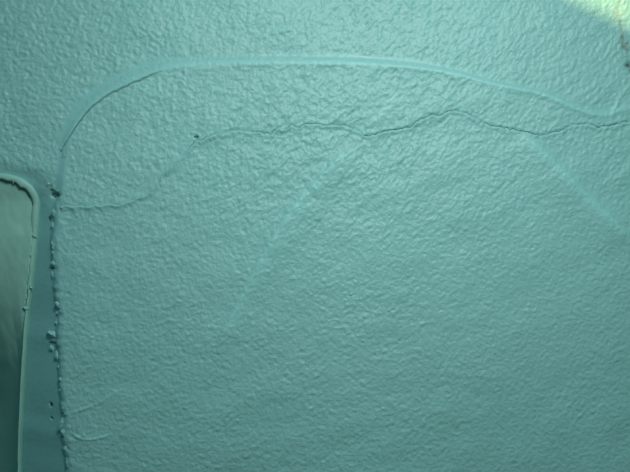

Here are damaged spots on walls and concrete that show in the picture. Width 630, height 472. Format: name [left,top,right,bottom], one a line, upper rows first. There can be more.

crack [58,69,162,152]
crack [61,107,630,213]